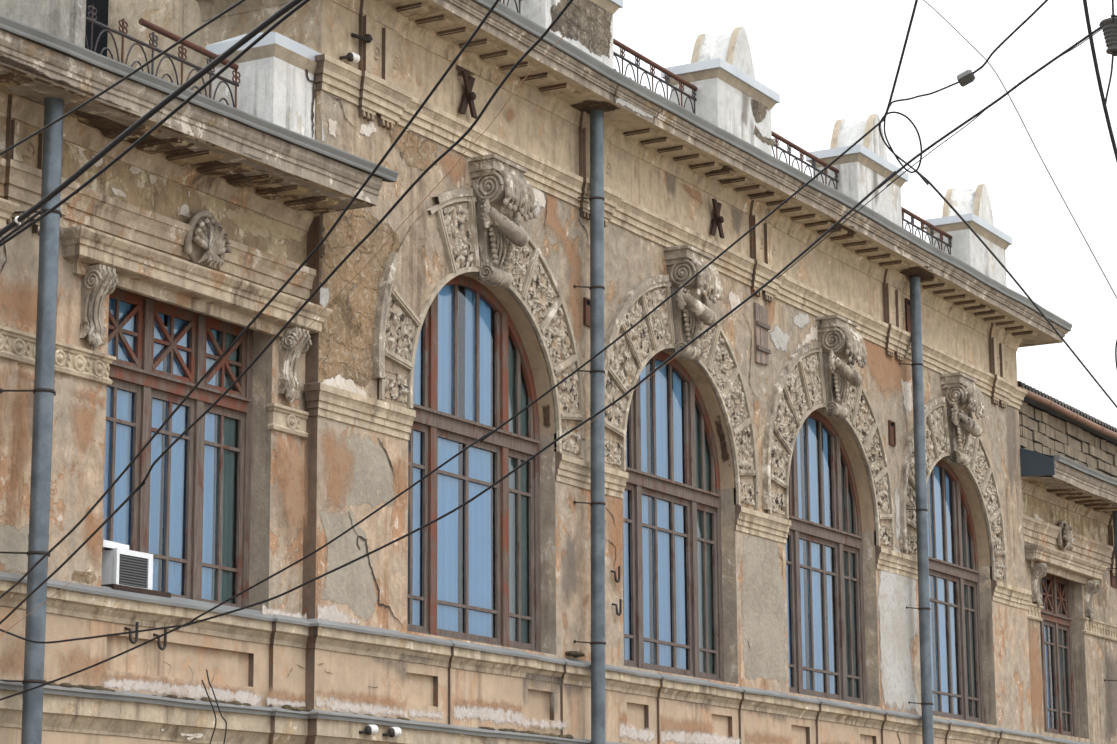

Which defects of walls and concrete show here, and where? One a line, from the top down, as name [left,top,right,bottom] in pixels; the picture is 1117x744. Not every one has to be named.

flaking render [72,571,97,584]
crack [349,512,404,628]
water stain [104,673,576,729]